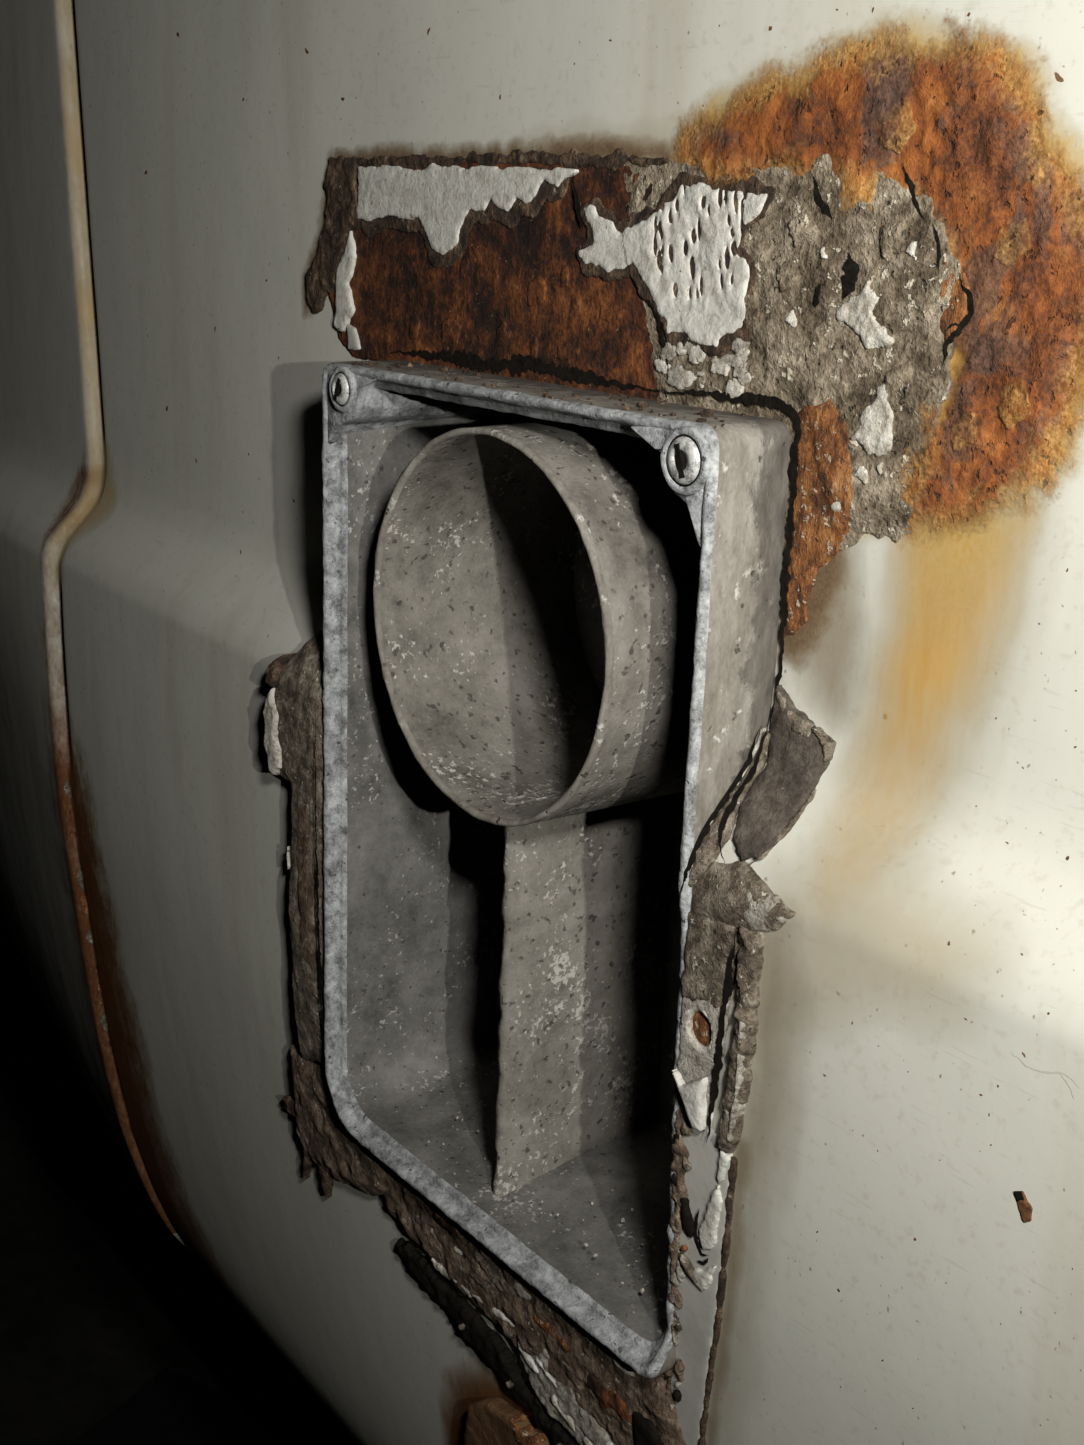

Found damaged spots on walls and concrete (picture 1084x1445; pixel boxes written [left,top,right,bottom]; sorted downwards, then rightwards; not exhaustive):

peeling [334,163,579,350]
peeling [576,172,776,398]
peeling [785,310,797,328]
peeling [777,209,828,292]
peeling [836,281,895,349]
peeling [879,220,917,260]
crack [902,164,974,370]
corrosion [674,12,1084,793]
peeling [850,362,914,484]
corrosion [445,1373,550,1445]